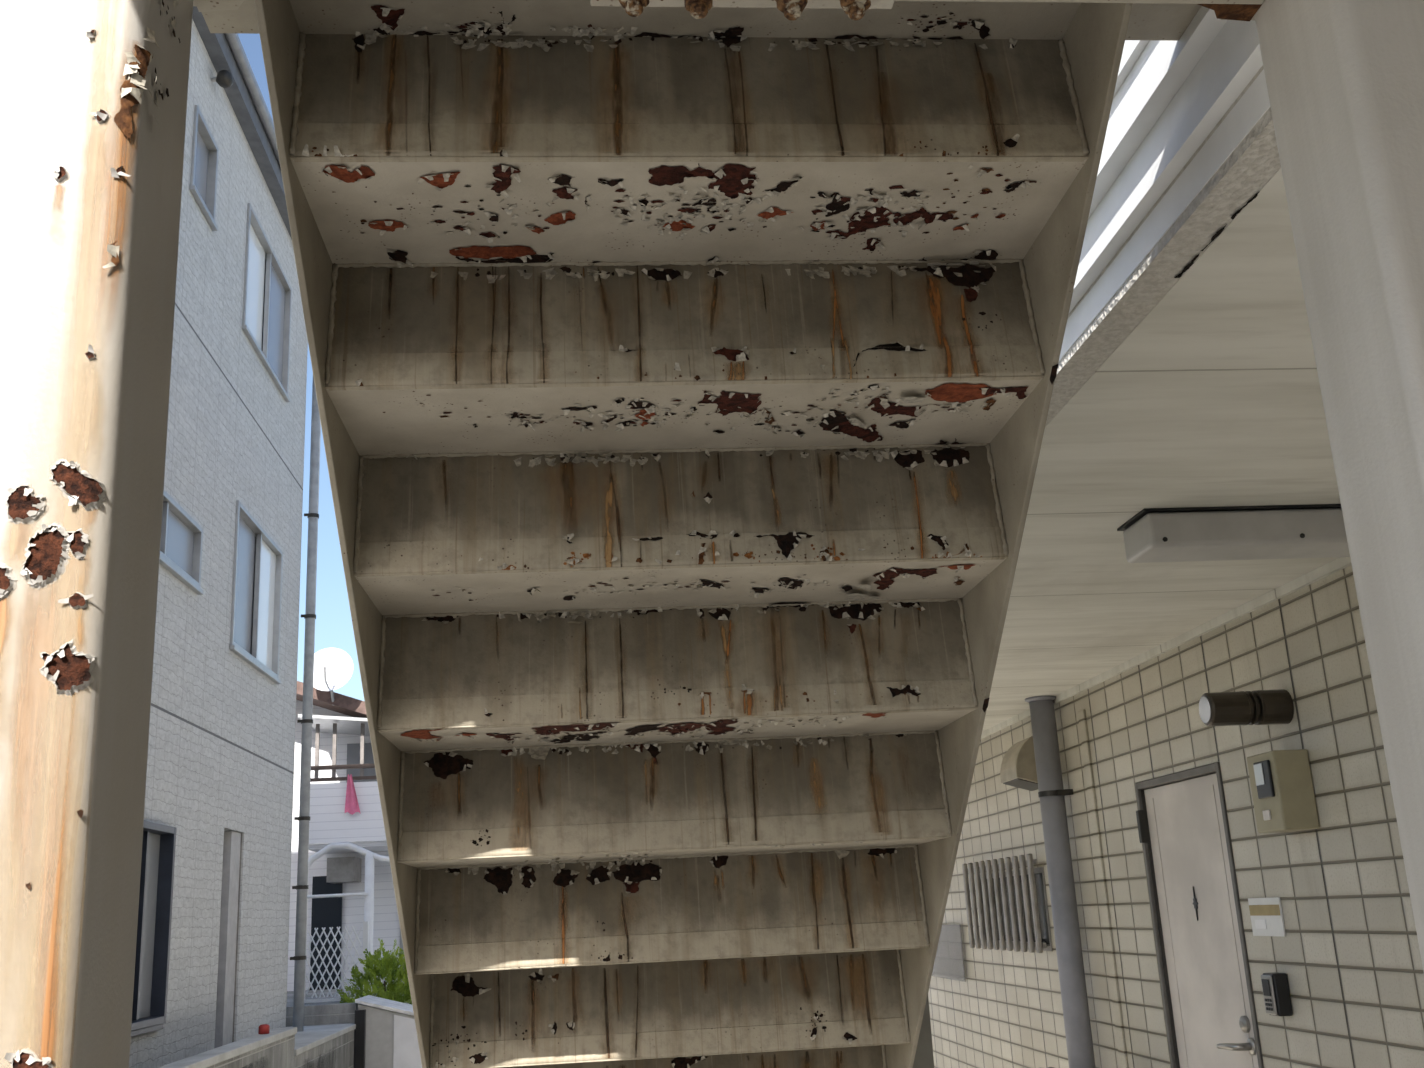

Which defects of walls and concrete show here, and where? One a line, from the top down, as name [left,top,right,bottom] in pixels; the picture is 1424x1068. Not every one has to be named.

peeling [114,0,180,139]
corrosion [491,39,504,153]
corrosion [610,43,623,155]
peeling [302,144,376,204]
peeling [340,134,1037,330]
peeling [507,362,1029,470]
corrosion [0,0,138,1068]
peeling [496,530,982,634]
peeling [444,850,666,895]
corrosion [604,972,619,1059]
corrosion [622,895,638,1049]
corrosion [837,854,892,1027]